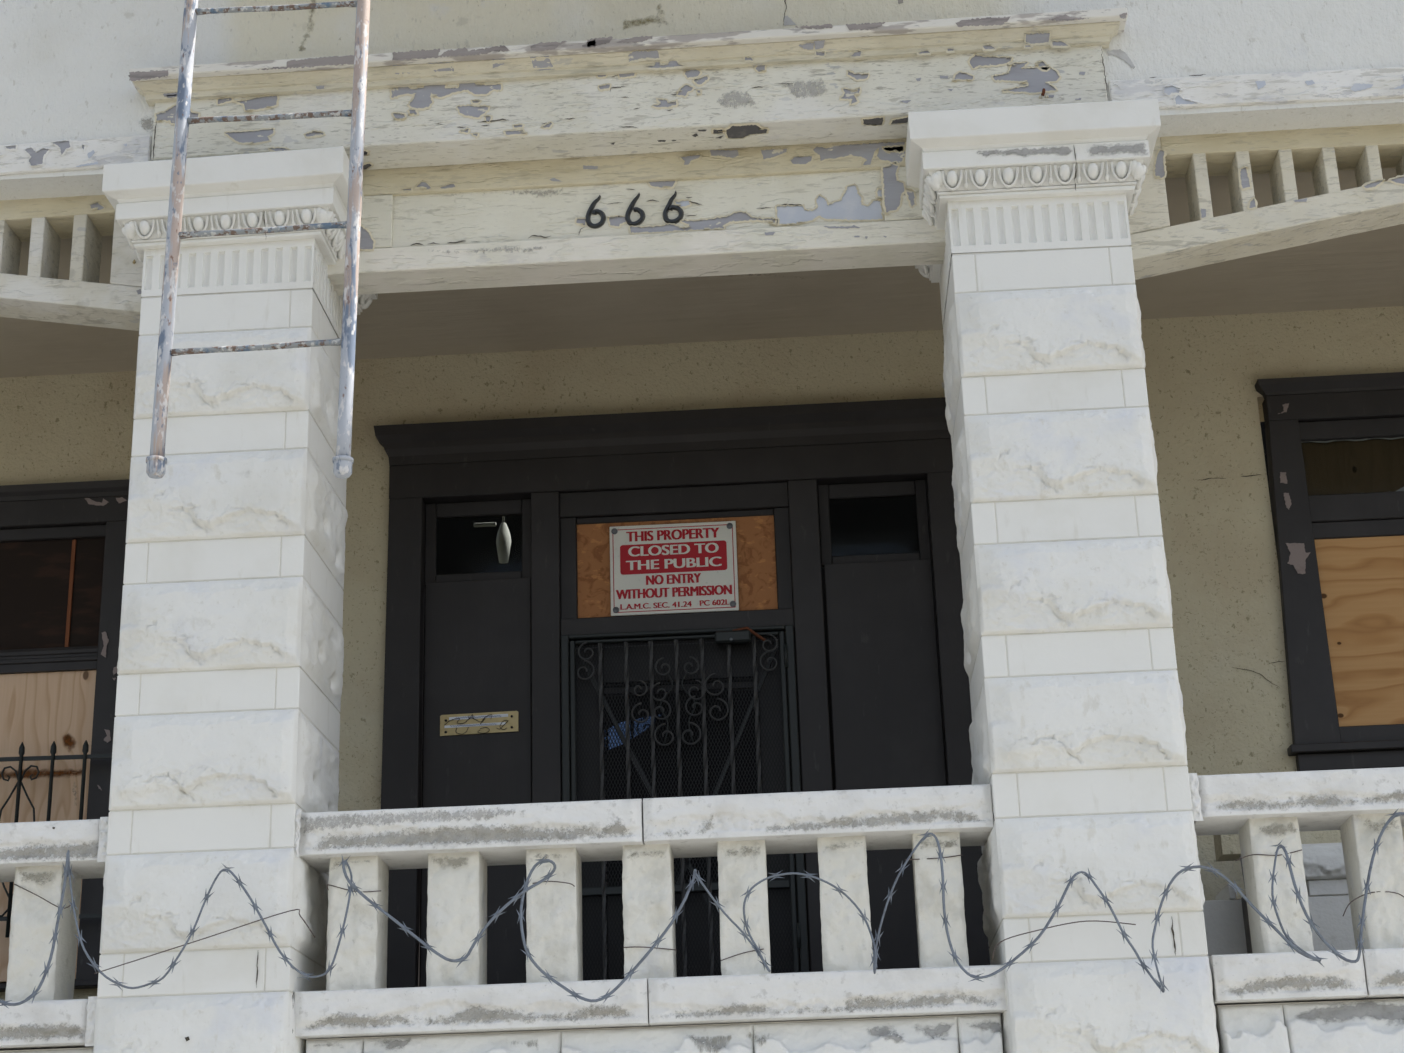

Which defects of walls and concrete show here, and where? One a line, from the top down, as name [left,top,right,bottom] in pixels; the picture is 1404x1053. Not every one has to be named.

peeling [256,55,354,70]
peeling [389,45,554,139]
peeling [528,36,710,110]
peeling [784,15,885,58]
peeling [916,14,1089,98]
flaking render [1107,49,1135,68]
peeling [4,139,98,168]
peeling [606,50,917,239]
peeling [360,224,376,252]